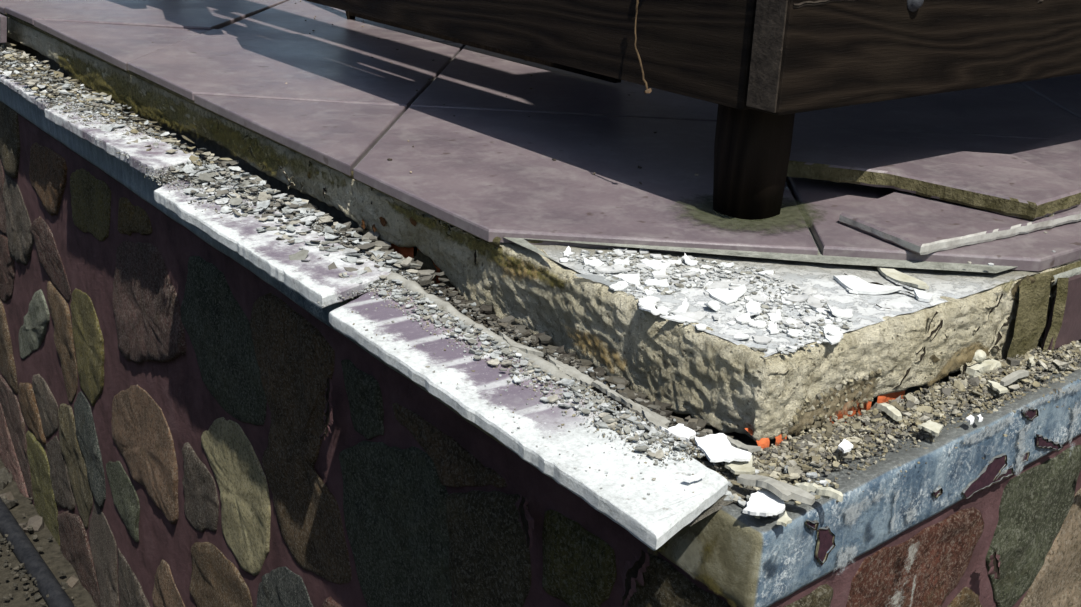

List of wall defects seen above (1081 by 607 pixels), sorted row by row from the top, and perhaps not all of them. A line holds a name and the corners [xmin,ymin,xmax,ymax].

peeling [560,246,853,355]
crack [842,273,947,389]
crack [973,292,1016,353]
peeling [1023,407,1039,422]
peeling [962,434,1063,499]
peeling [805,519,836,565]